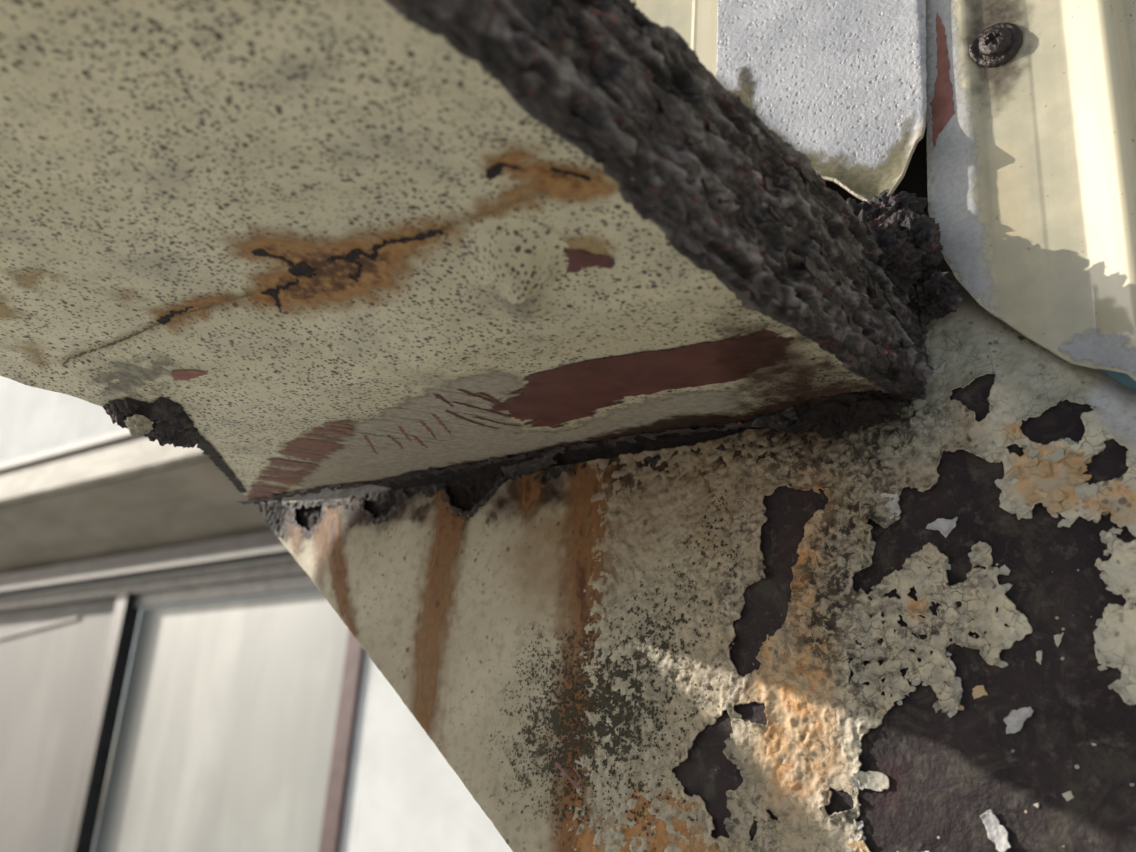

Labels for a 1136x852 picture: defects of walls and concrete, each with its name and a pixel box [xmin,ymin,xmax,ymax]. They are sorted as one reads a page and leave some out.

corrosion [478,151,617,215]
corrosion [152,294,234,326]
crack [63,170,599,365]
corrosion [234,221,452,313]
corrosion [846,189,962,325]
peeling [949,374,996,422]
peeling [1059,330,1136,378]
corrosion [102,326,902,852]
leakage [486,490,751,852]
peeling [729,484,829,677]
peeling [825,399,1136,852]
peeling [749,810,780,841]